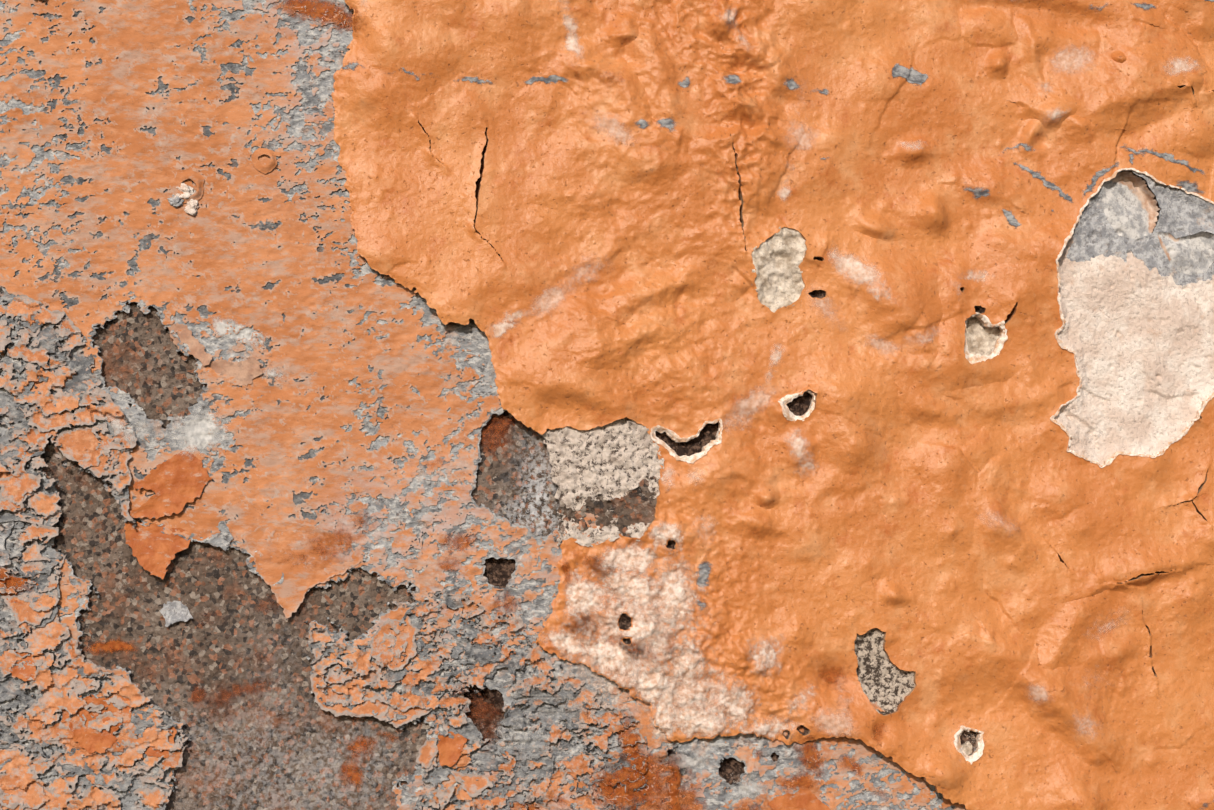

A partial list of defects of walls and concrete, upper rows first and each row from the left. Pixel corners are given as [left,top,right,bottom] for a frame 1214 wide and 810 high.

crack [474,129,488,233]
peeling [751,227,807,313]
peeling [1050,168,1214,468]
spalling [0,294,664,810]
peeling [854,628,915,715]
peeling [767,789,830,810]